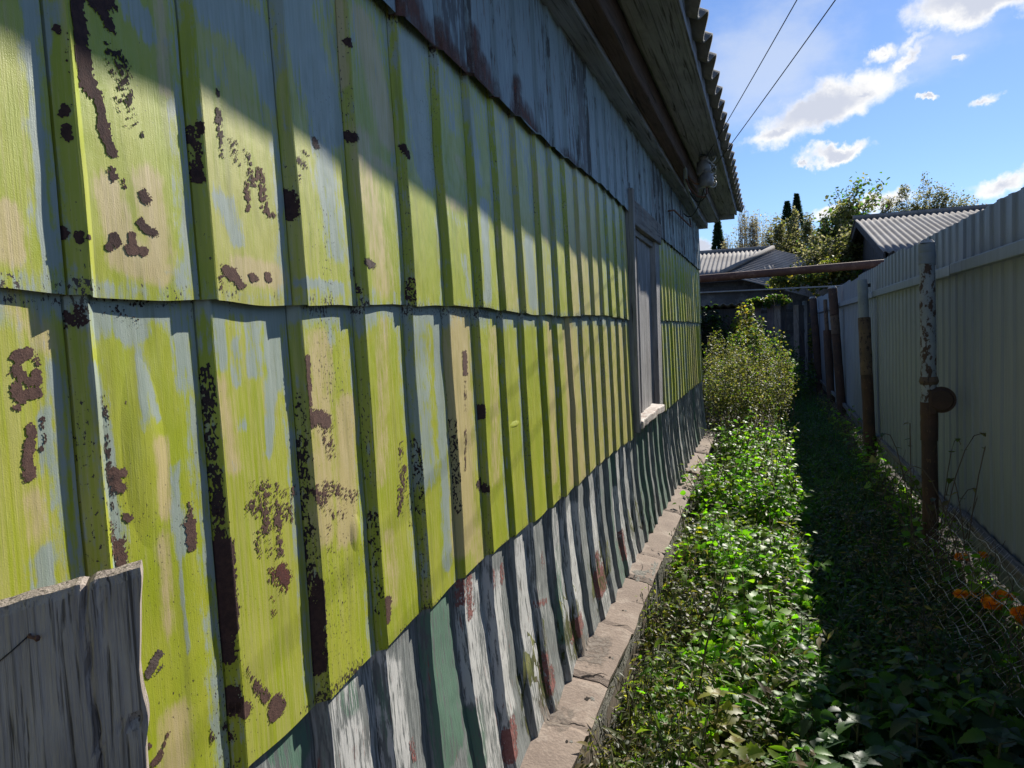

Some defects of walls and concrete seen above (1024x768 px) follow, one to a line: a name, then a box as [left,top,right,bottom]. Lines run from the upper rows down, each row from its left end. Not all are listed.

corrosion [51,0,159,257]
corrosion [185,88,320,221]
corrosion [218,263,272,290]
corrosion [8,346,44,411]
corrosion [22,416,47,483]
corrosion [101,395,134,567]
corrosion [181,502,198,552]
corrosion [199,363,287,745]
corrosion [245,354,360,676]
corrosion [144,649,165,679]